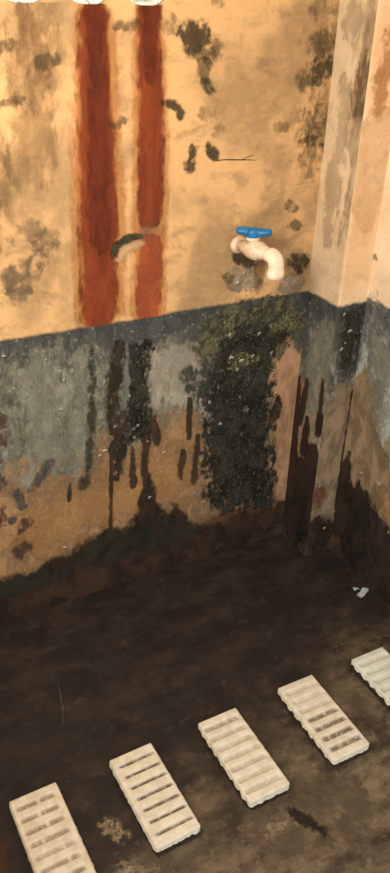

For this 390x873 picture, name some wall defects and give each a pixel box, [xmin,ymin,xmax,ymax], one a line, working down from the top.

leakage [176,19,210,55]
leakage [311,55,333,87]
leakage [161,99,185,120]
rust [72,3,169,328]
leakage [185,142,219,173]
leakage [105,338,169,481]
leakage [0,374,390,622]